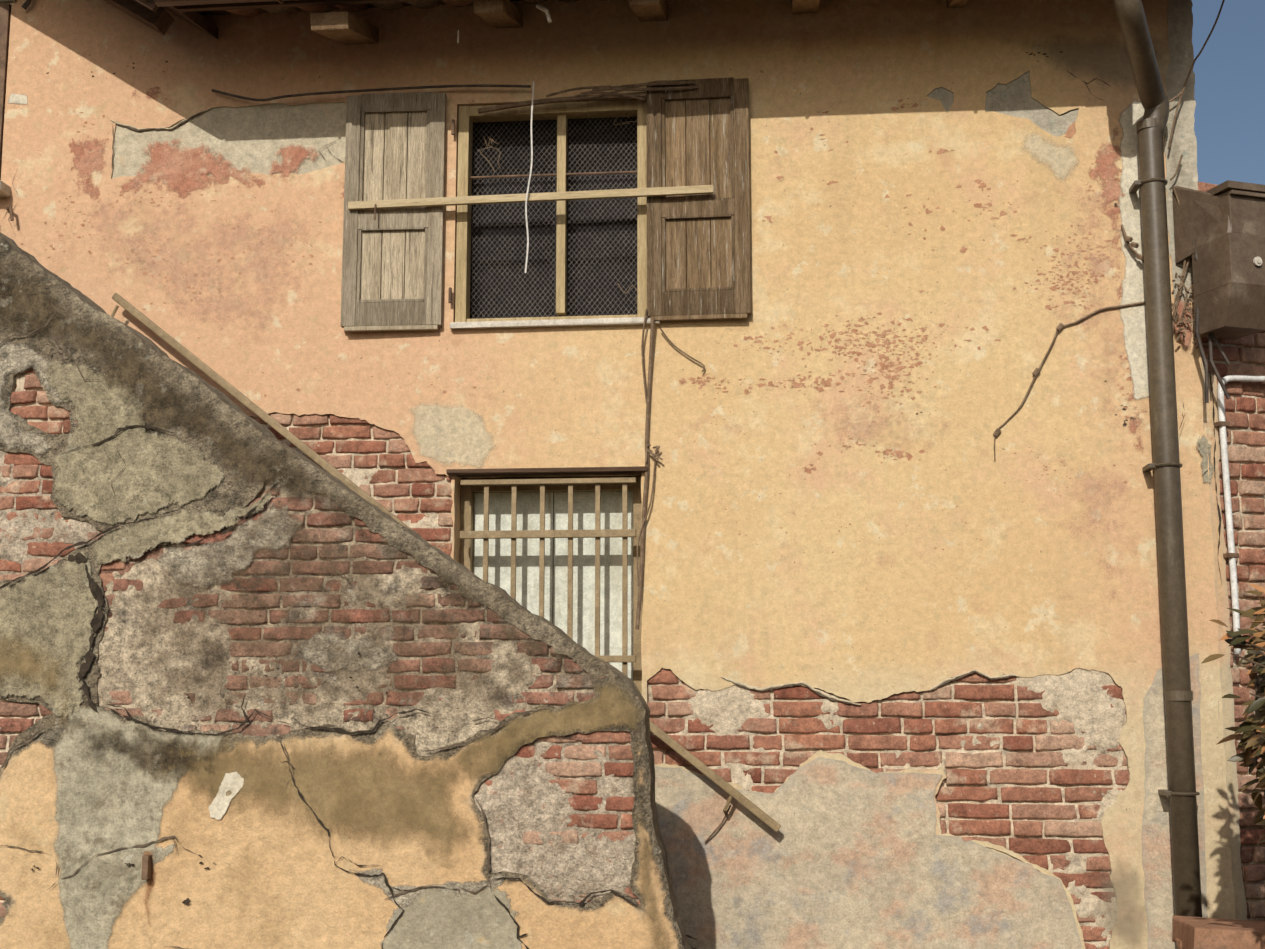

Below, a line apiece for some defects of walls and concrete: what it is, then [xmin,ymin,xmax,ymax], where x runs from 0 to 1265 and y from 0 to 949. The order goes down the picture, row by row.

flaking render [985,72,1078,138]
flaking render [21,102,347,316]
peeling [957,179,1019,222]
flaking render [10,369,78,434]
flaking render [0,450,103,581]
crack [62,425,177,495]
crack [187,482,279,545]
flaking render [250,369,493,556]
flaking render [97,481,605,756]
flaking render [0,699,53,767]
crack [0,508,644,949]
flaking render [647,668,1129,949]